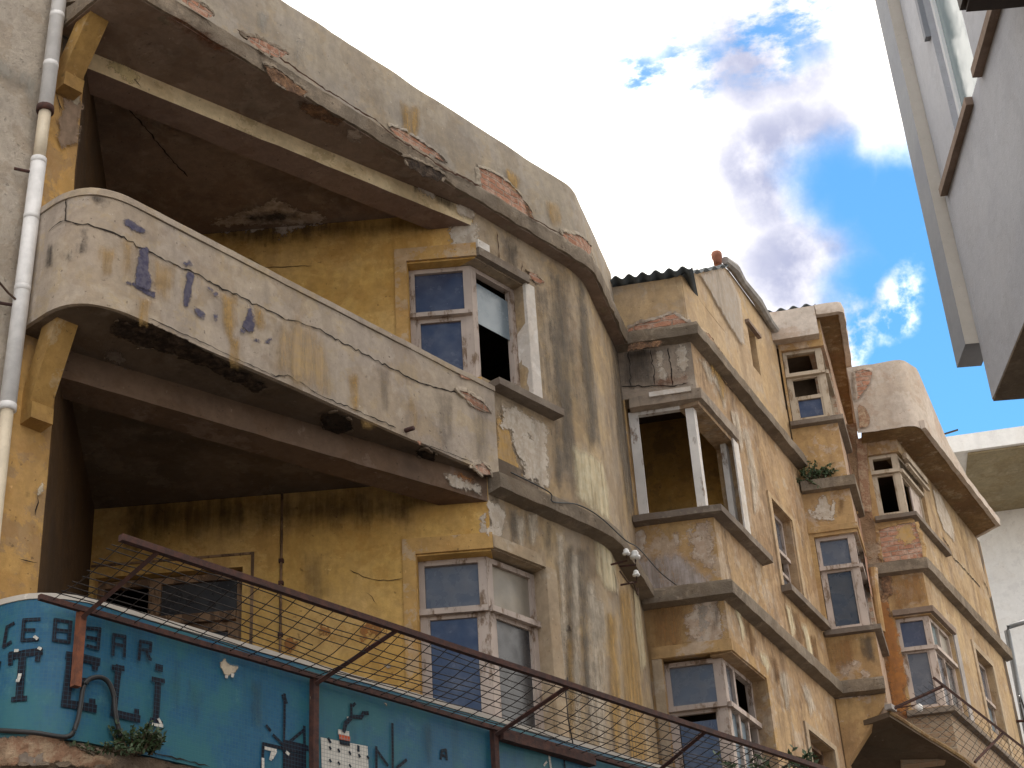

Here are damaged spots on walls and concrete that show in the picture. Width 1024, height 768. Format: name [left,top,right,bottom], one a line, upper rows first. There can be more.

spalling [239,30,363,144]
spalling [388,123,480,244]
spalling [110,319,266,393]
crack [49,200,457,393]
crack [150,318,396,428]
peeling [445,374,550,536]
water stain [511,514,536,545]
water stain [550,279,610,518]
water stain [612,340,690,514]
crack [622,349,686,387]
spalling [848,367,927,598]
water stain [549,532,621,750]